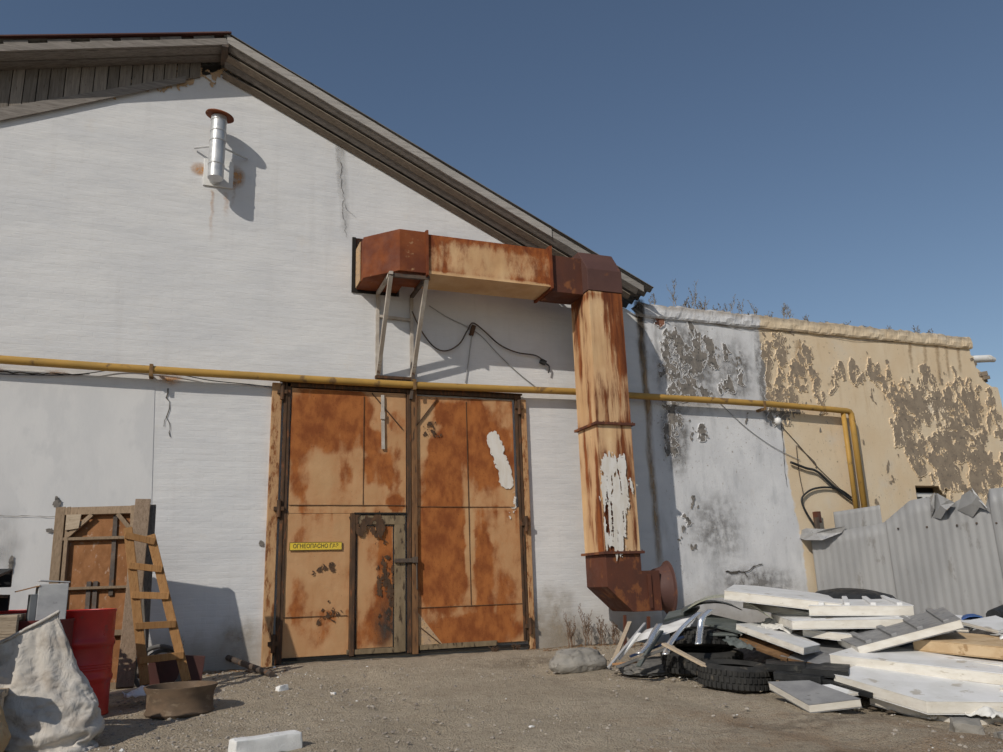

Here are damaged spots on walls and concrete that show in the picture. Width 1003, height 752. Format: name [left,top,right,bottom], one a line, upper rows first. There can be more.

crack [163,388,171,437]
flaking render [653,318,746,460]
flaking render [759,332,1003,501]